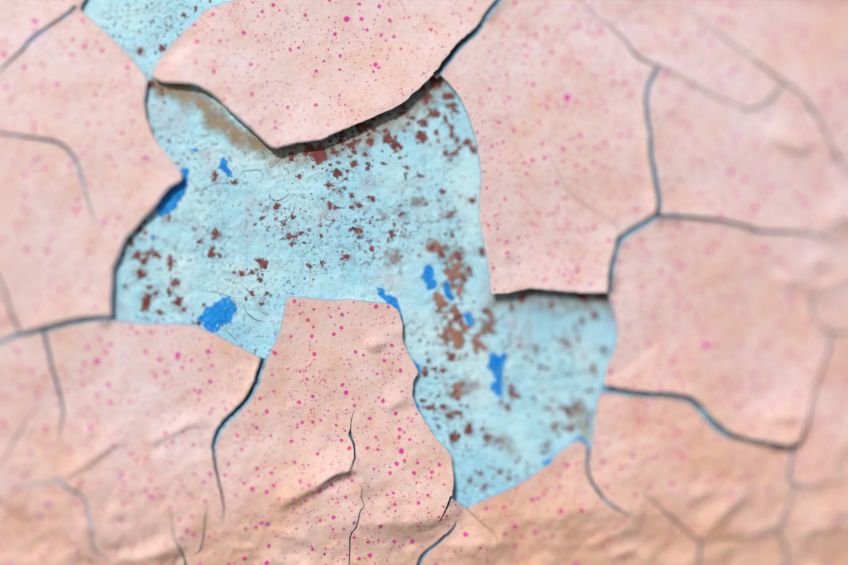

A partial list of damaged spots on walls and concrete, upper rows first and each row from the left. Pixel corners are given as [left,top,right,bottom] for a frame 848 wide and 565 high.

corrosion [123,220,202,326]
corrosion [191,222,278,321]
peeling [0,0,496,233]
corrosion [253,195,361,280]
corrosion [288,78,477,263]
peeling [0,75,837,528]
corrosion [418,188,511,457]
peeling [439,0,848,294]
crack [171,357,265,565]
crack [320,412,364,565]
crack [417,496,499,565]
crack [600,384,818,565]